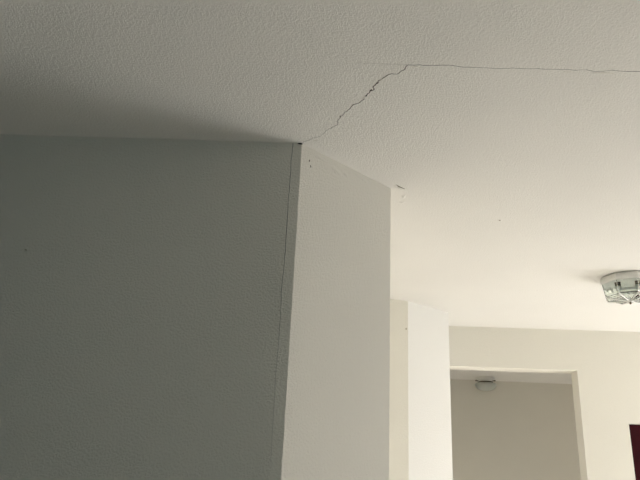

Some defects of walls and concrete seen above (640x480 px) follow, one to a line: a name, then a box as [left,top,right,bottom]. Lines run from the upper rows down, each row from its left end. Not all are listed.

crack [281,63,539,291]